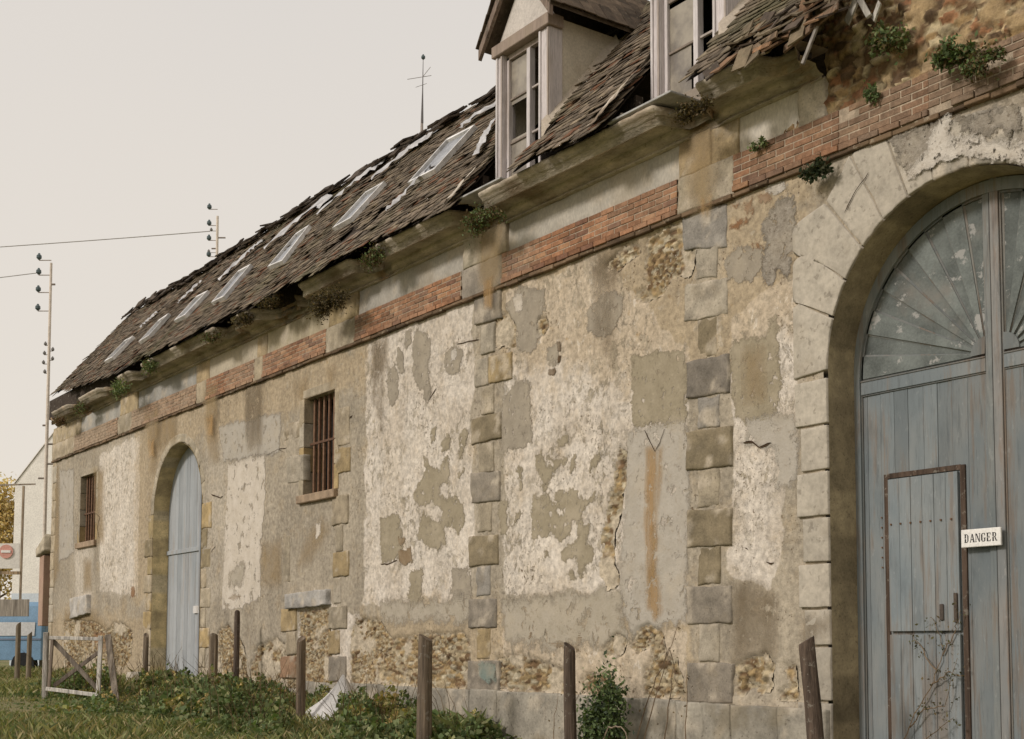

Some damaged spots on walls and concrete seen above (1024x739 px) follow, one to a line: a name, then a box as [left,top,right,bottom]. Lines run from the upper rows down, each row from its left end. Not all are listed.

peeling [887,102,1023,175]
flaking render [587,221,697,338]
peeling [378,425,472,608]
peeling [497,380,627,591]
corrosion [646,450,658,616]
flaking render [62,620,134,670]
flaking render [349,618,472,689]
flaking render [498,654,564,694]
flaking render [603,625,685,700]
flaking render [735,653,799,702]